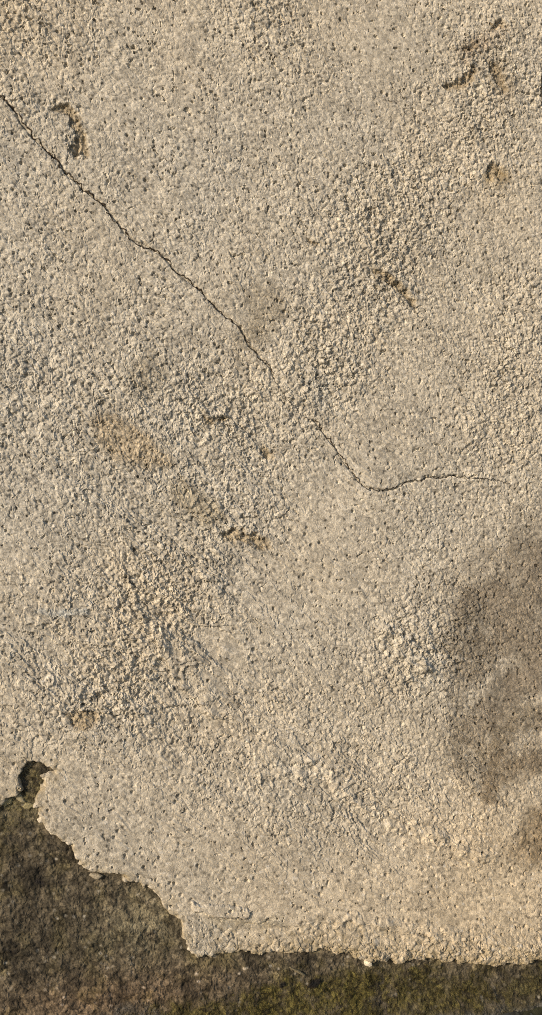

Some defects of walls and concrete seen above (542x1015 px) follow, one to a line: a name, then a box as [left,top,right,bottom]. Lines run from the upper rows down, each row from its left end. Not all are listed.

crack [0,95,510,492]
spalling [0,761,201,987]